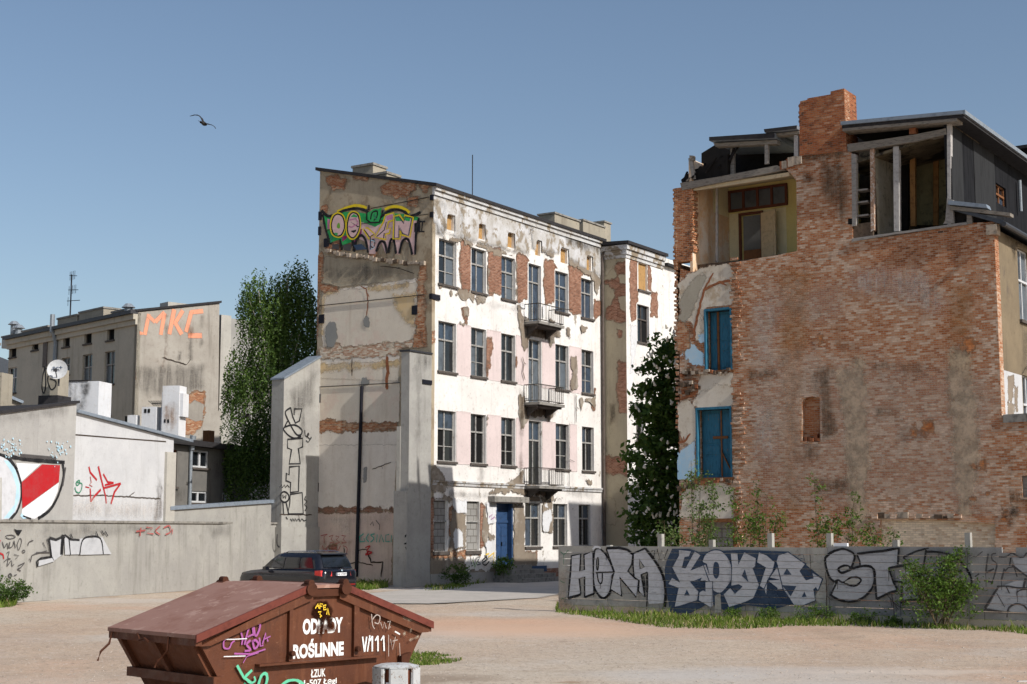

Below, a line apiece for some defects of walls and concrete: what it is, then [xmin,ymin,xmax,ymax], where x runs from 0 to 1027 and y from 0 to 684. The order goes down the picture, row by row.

peeling [316,180,658,414]
flaking render [675,310,704,356]
flaking render [185,390,206,435]
flaking render [319,418,397,434]
peeling [693,383,734,408]
flaking render [318,504,394,514]
peeling [431,465,561,575]